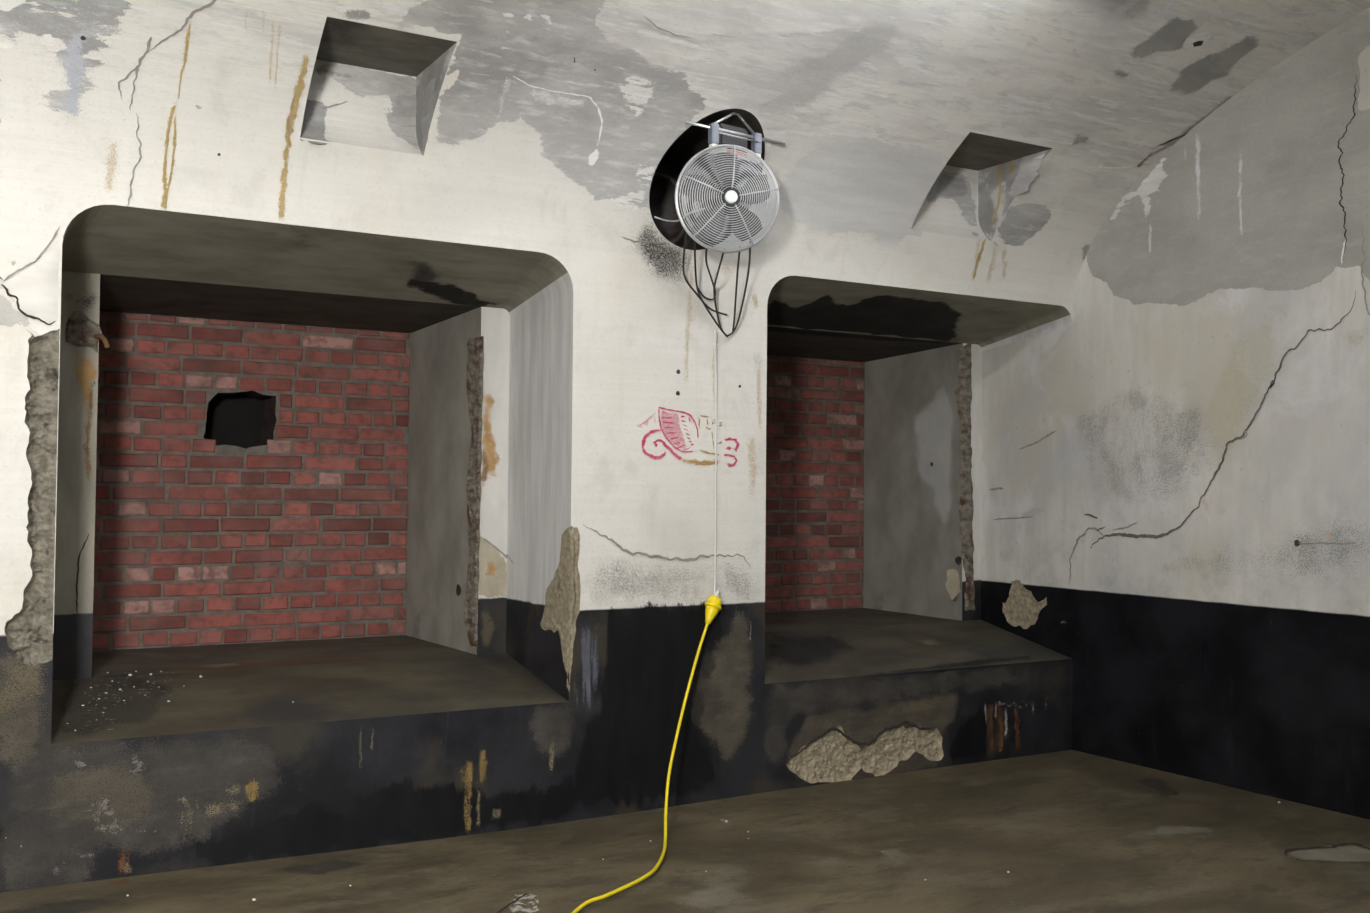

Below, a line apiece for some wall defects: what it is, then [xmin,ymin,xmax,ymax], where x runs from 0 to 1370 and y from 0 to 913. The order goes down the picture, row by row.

crack [102,0,216,206]
rust [160,21,191,210]
rust [278,54,310,220]
peeling [300,0,904,208]
crack [1,284,55,325]
crack [1069,74,1370,584]
spalling [5,292,102,667]
crack [583,524,751,569]
rust [460,750,501,832]
spalling [526,526,601,761]
spalling [786,721,944,783]
rust [984,698,1047,756]